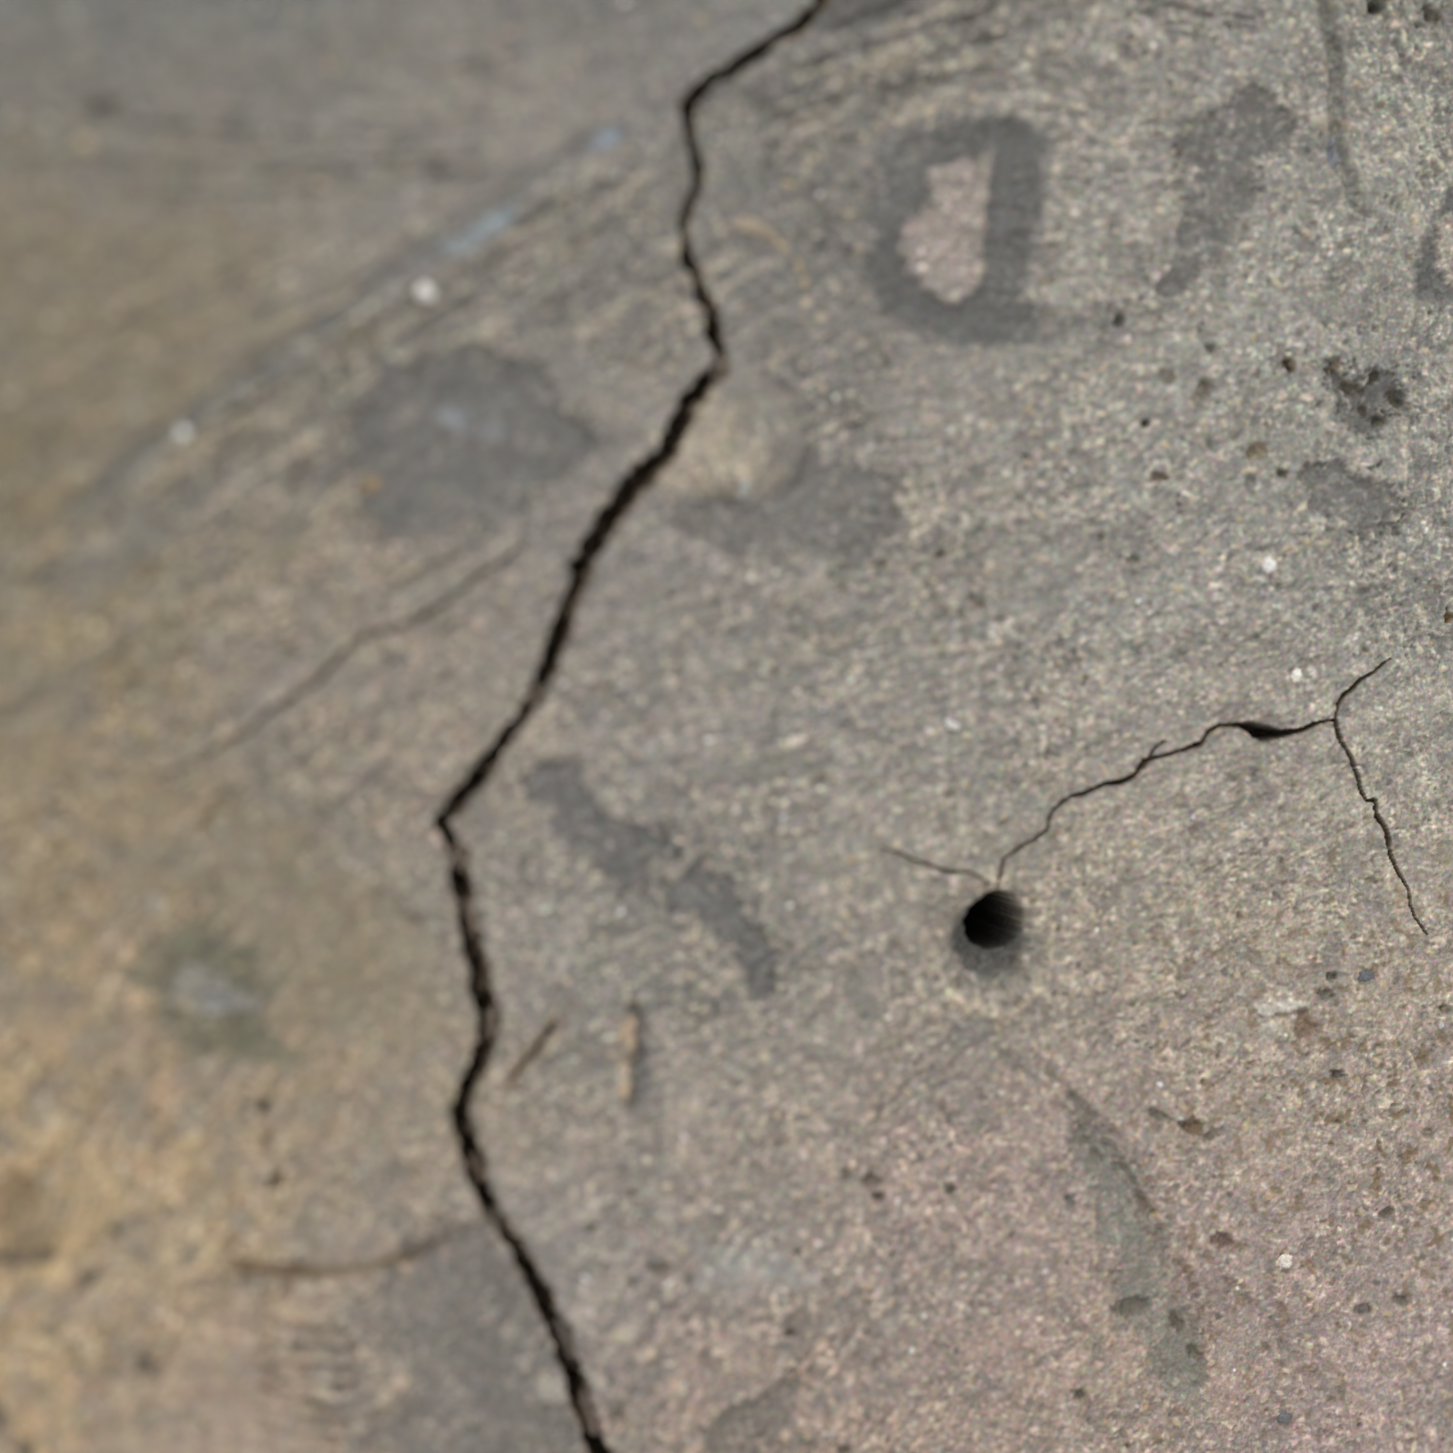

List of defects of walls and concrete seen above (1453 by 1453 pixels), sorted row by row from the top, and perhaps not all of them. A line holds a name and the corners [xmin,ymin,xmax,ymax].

crack [134,535,531,784]
crack [433,0,831,1453]
crack [879,657,1428,936]